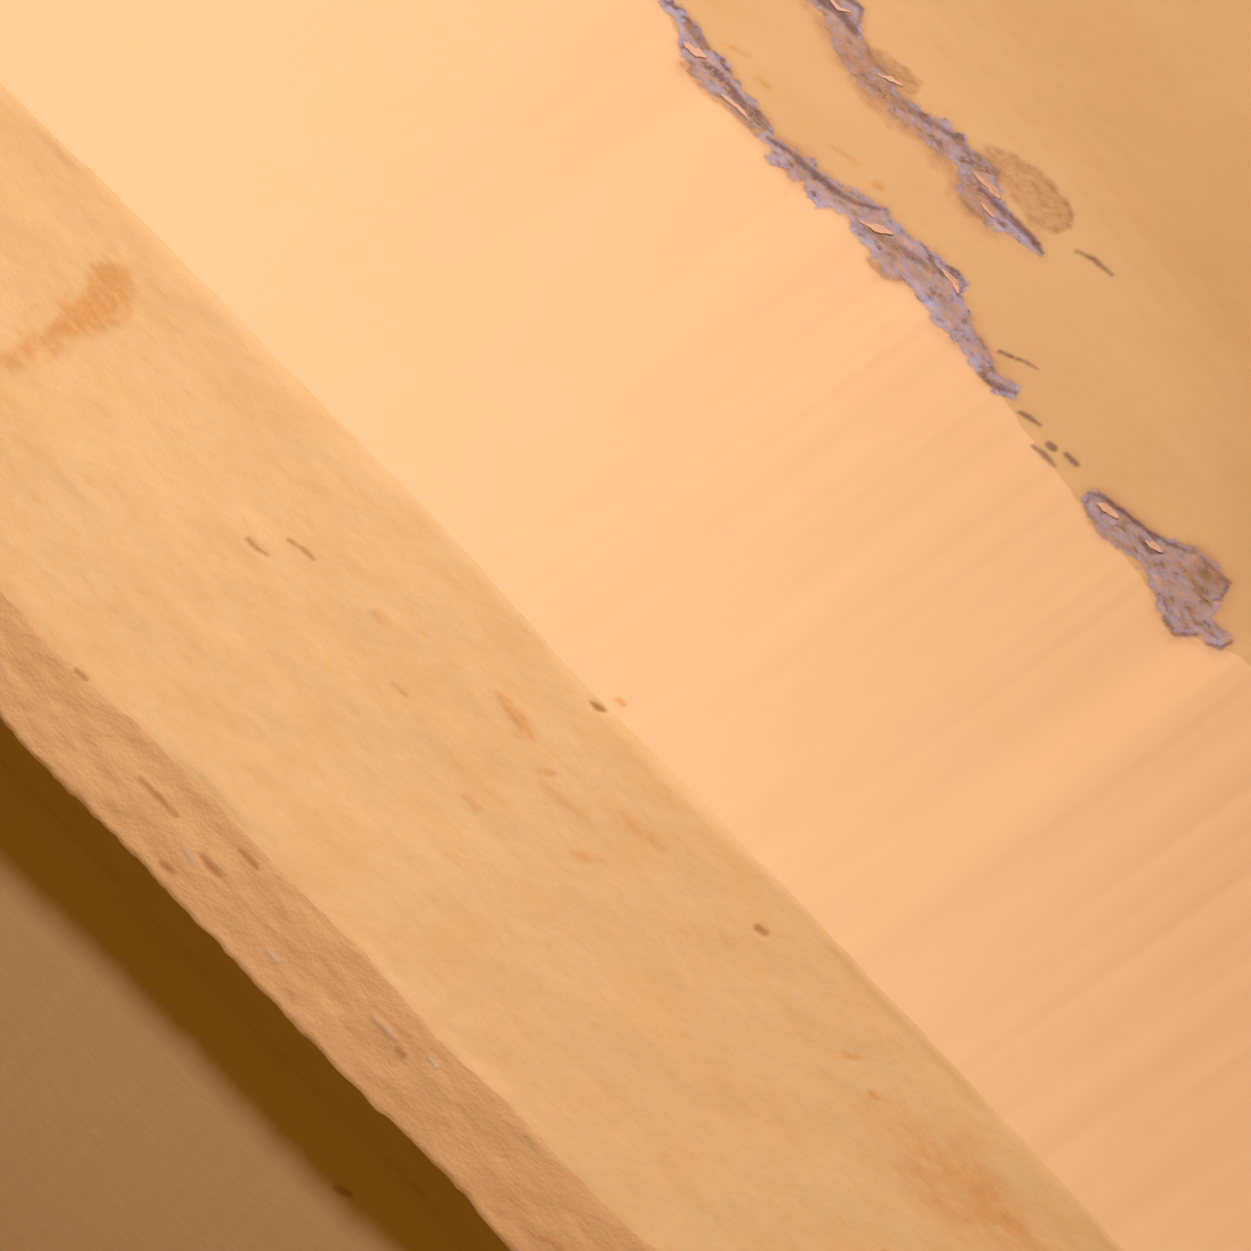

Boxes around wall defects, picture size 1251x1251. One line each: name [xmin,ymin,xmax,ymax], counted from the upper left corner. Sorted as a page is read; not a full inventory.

peeling [661,0,1065,422]
peeling [1036,443,1078,465]
peeling [1082,491,1232,650]